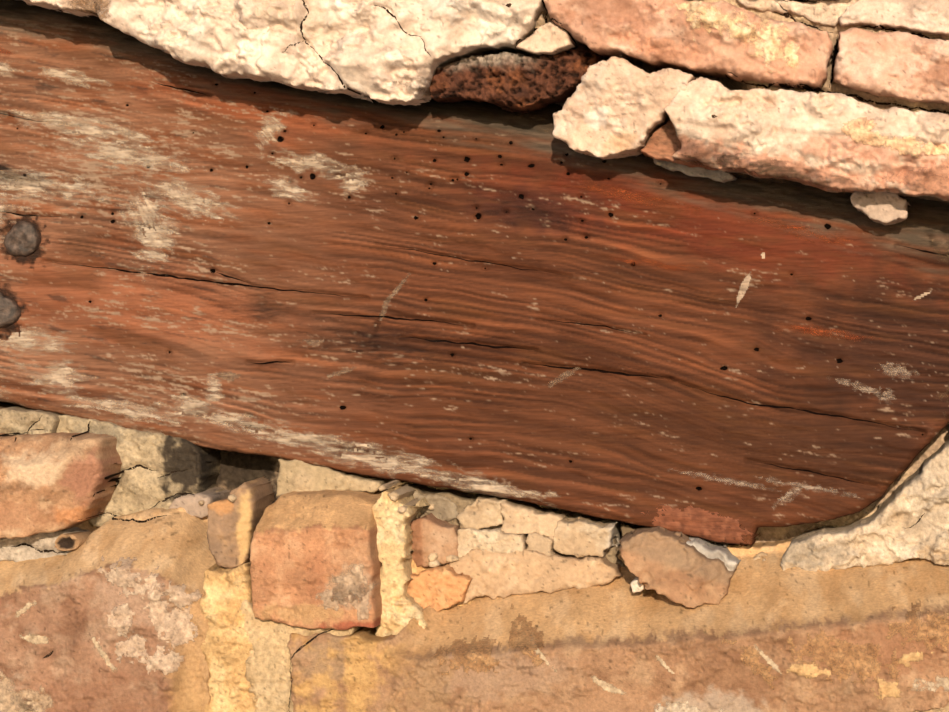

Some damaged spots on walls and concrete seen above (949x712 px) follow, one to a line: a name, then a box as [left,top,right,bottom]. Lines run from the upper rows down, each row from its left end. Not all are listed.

crack [284,0,375,104]
crack [158,83,206,95]
corrosion [0,214,51,268]
crack [377,244,561,275]
corrosion [0,284,25,311]
crack [52,262,920,432]
crack [0,418,44,442]